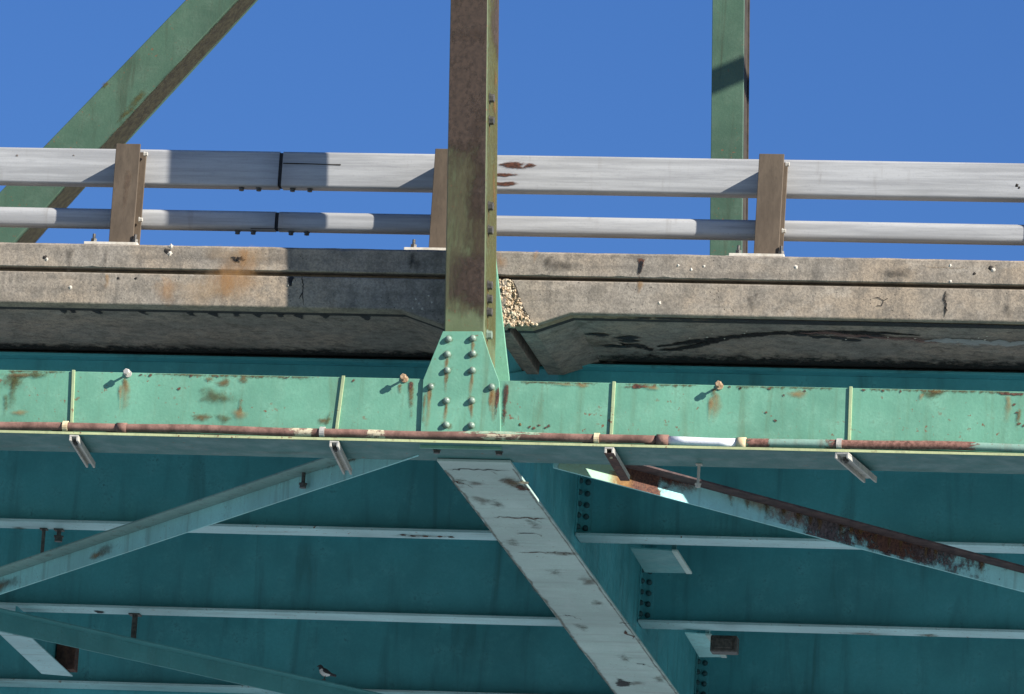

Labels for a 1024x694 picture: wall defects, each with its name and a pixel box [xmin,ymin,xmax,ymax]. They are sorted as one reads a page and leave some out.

corrosion [448,0,536,328]
spalling [499,279,538,328]
crack [927,266,967,317]
leakage [925,338,1024,347]
corrosion [5,373,43,405]
corrosion [208,376,227,401]
corrosion [490,385,509,418]
corrosion [746,438,770,447]
corrosion [827,439,980,451]
corrosion [604,453,694,496]
corrosion [746,500,985,578]